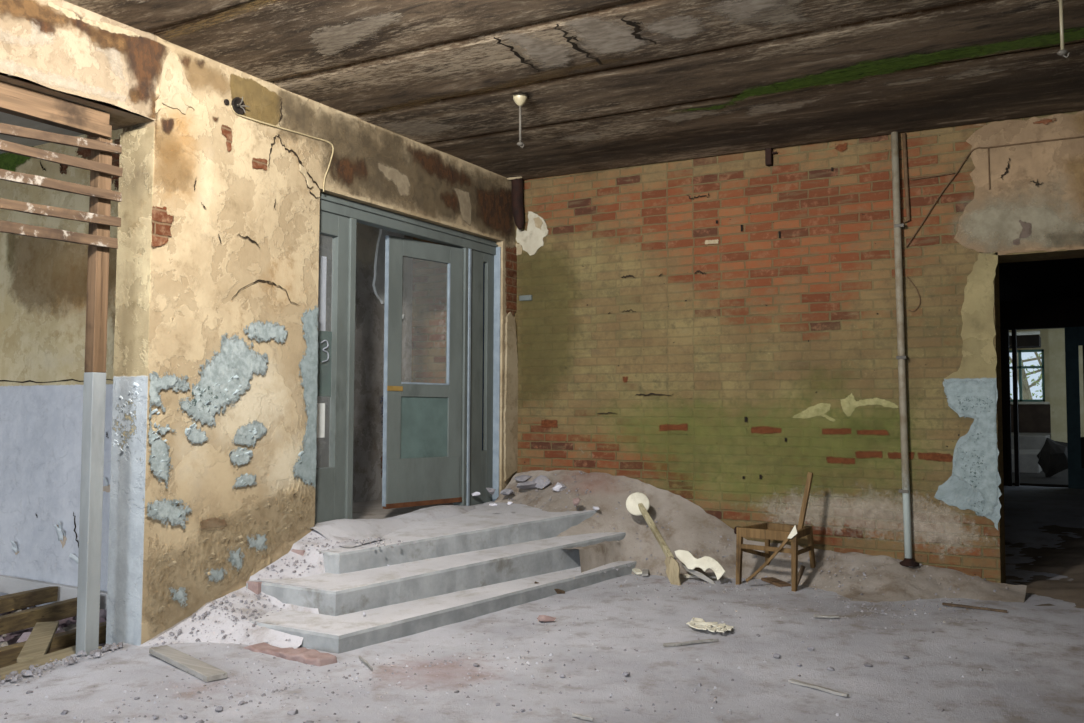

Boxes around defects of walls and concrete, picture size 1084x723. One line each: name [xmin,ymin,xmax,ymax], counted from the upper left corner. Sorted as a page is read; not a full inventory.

crack [494,37,540,72]
crack [554,24,603,65]
crack [616,15,657,44]
crack [268,99,320,198]
flaking render [151,206,174,248]
flaking render [505,211,549,315]
peeling [119,305,319,632]
flaking render [751,426,781,434]
flaking render [792,393,898,435]
peeling [826,380,999,516]